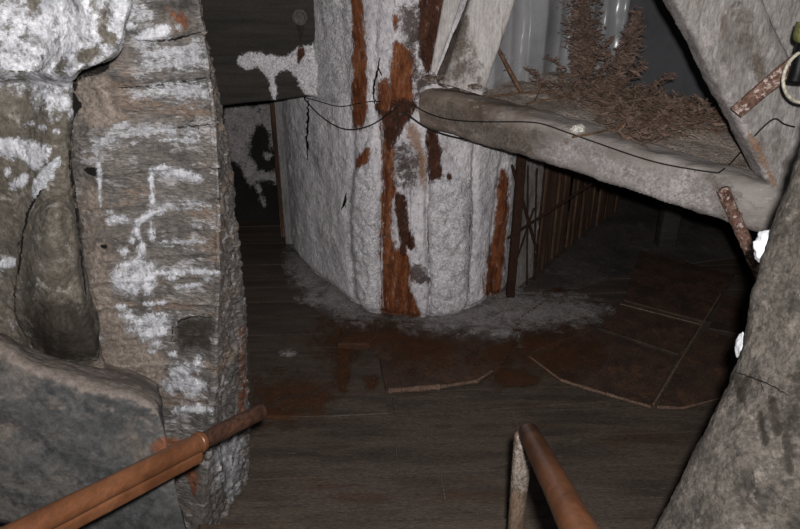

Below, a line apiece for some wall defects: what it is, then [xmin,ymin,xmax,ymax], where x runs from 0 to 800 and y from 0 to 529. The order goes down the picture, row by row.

efflorescence [0,136,52,191]
efflorescence [0,0,211,134]
damp [223,0,353,207]
crack [303,100,311,160]
crack [372,58,382,105]
rust [350,0,452,318]
efflorescence [89,121,220,415]
rust [482,169,509,297]
crack [735,372,789,396]